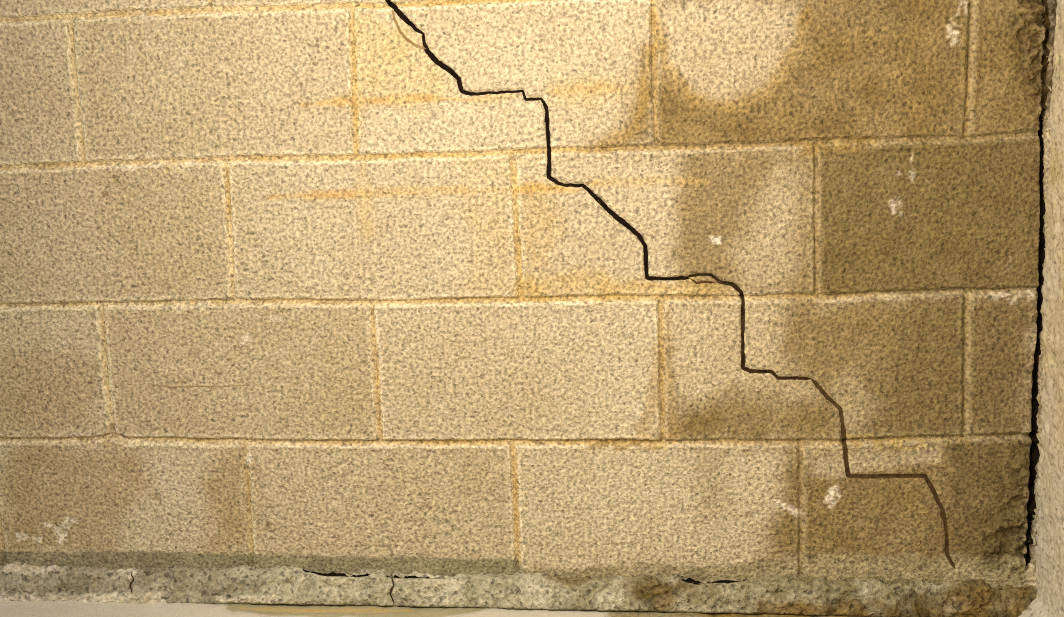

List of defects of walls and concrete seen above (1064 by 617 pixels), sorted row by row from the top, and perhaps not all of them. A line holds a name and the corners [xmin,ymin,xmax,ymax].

crack [385,0,956,569]
leakage [564,0,1057,575]
crack [1024,0,1051,566]
leakage [222,603,506,617]